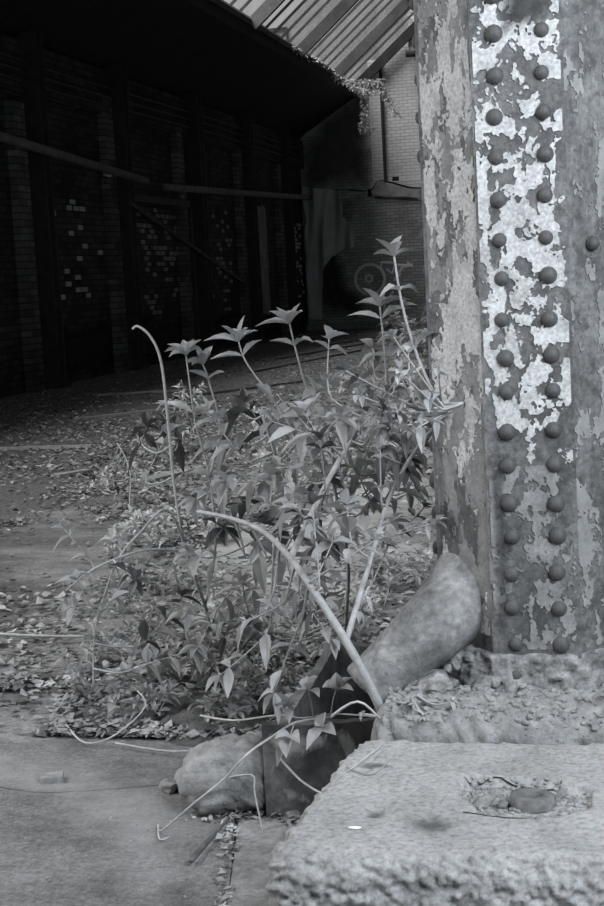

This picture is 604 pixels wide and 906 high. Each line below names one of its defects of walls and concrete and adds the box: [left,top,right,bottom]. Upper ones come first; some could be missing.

peeling [417,0,604,650]
crack [228,819,238,892]